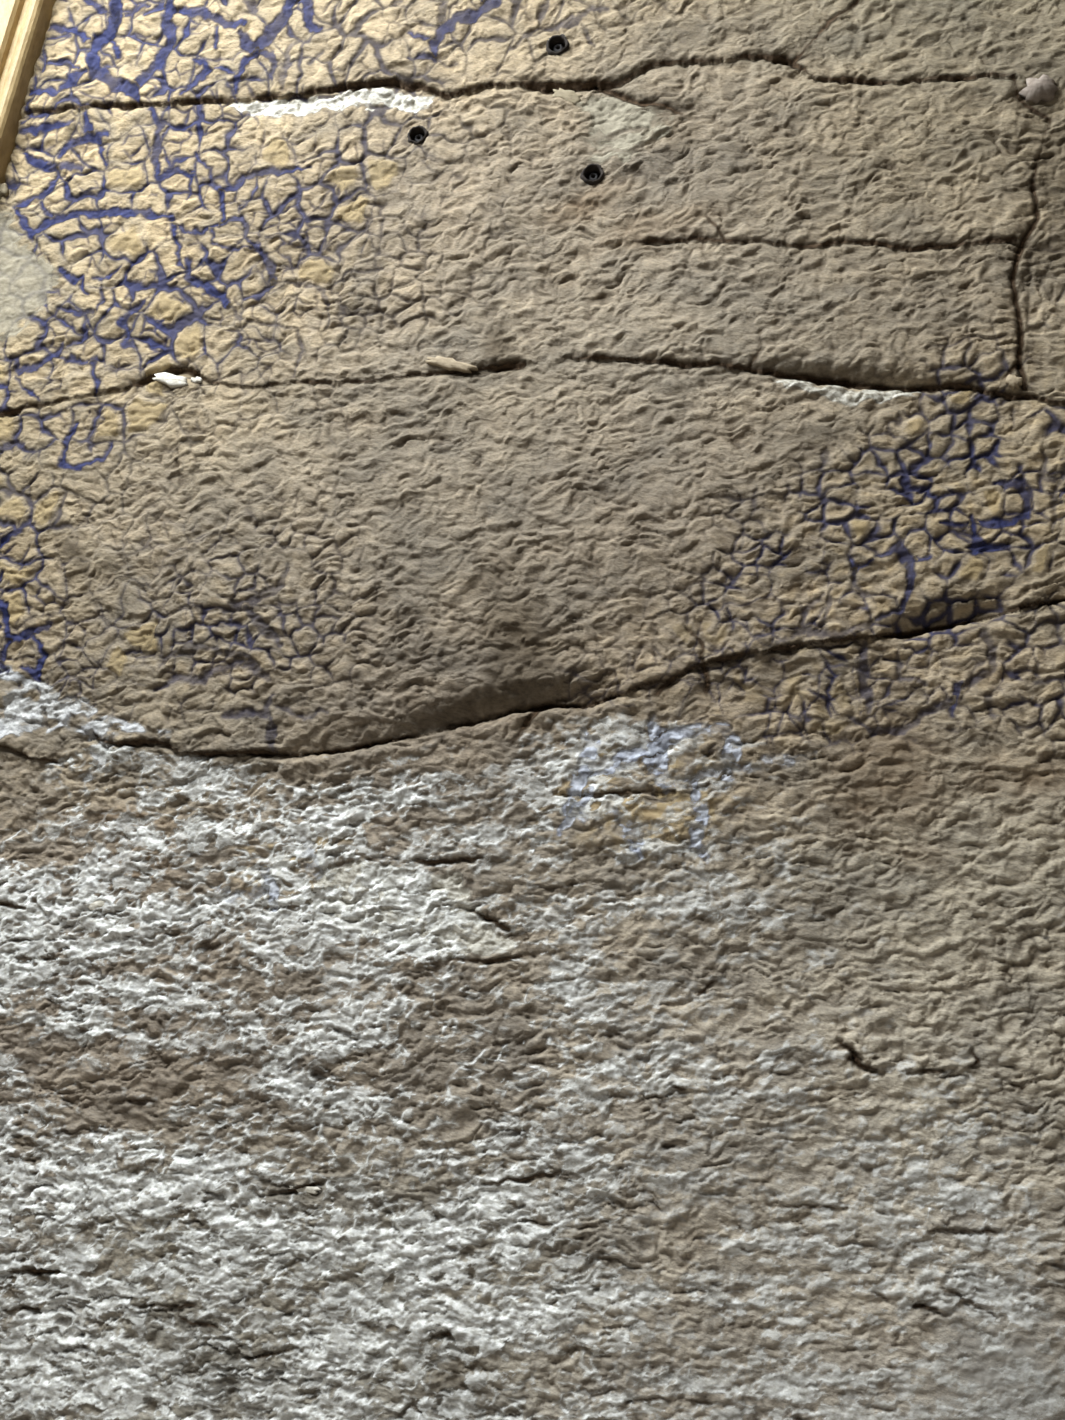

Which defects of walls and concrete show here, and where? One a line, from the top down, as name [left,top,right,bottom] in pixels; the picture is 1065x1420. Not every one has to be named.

spalling [230,87,434,117]
crack [23,0,1065,405]
peeling [152,372,203,389]
crack [0,362,526,417]
crack [94,599,1065,757]
crack [0,745,61,791]
damp [0,721,1049,1420]